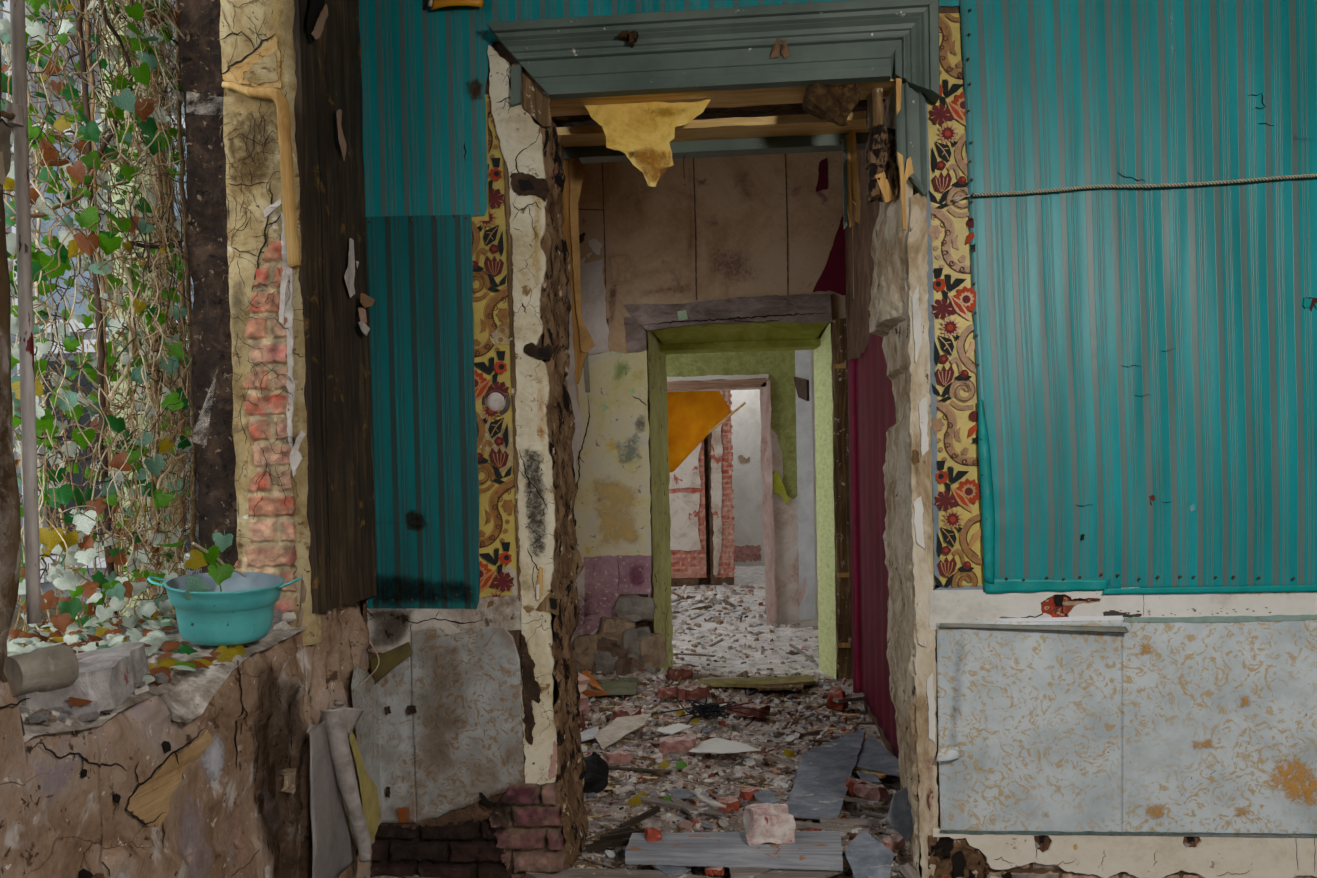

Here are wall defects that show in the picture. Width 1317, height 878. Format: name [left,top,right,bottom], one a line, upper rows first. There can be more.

crack [0,698,30,709]
crack [27,661,248,848]
flaking render [369,45,566,878]
flaking render [907,192,1196,878]